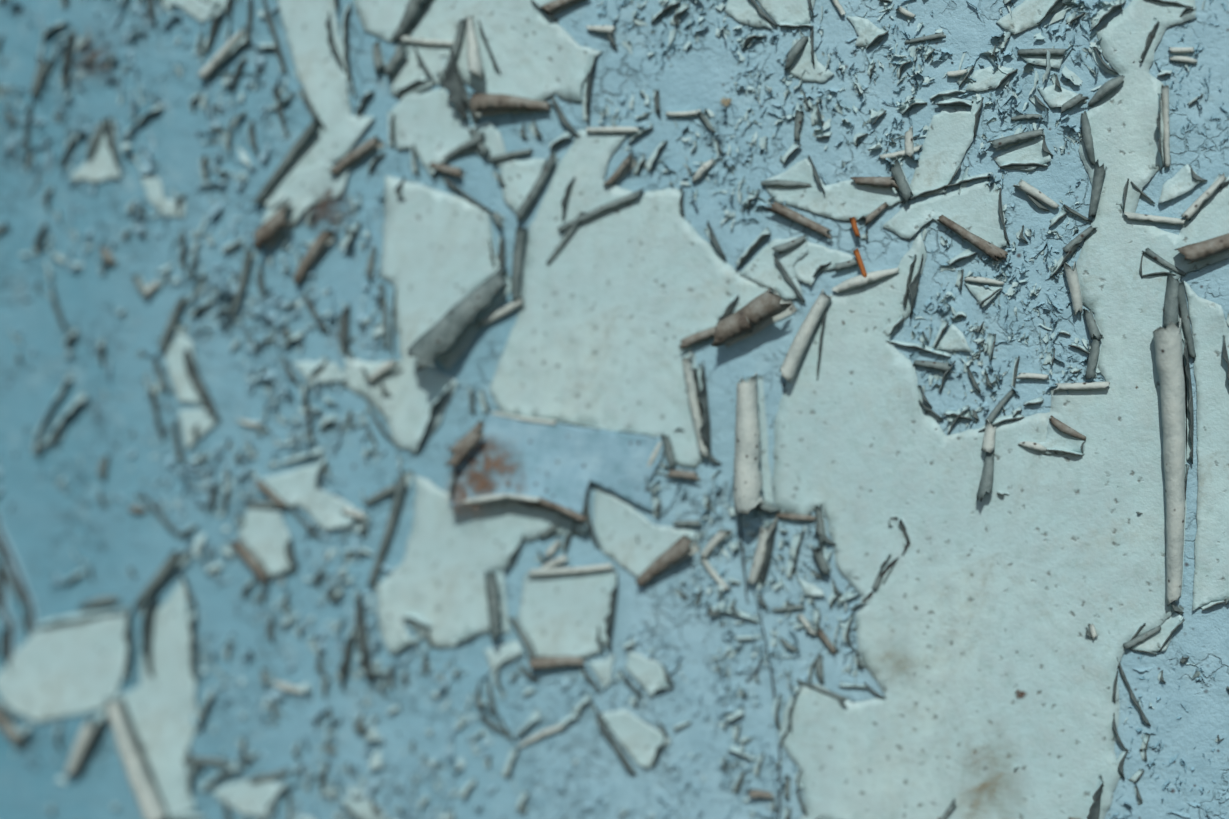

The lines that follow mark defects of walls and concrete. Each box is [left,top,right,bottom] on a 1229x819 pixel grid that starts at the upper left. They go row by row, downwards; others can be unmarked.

peeling [0,0,139,196]
peeling [520,120,542,140]
peeling [834,108,886,147]
peeling [1016,225,1035,244]
peeling [19,186,124,358]
peeling [24,369,97,460]
corrosion [455,440,516,505]
peeling [239,668,312,733]
peeling [1133,666,1166,687]
peeling [1173,656,1216,681]
peeling [1130,724,1164,780]
peeling [1162,754,1195,794]